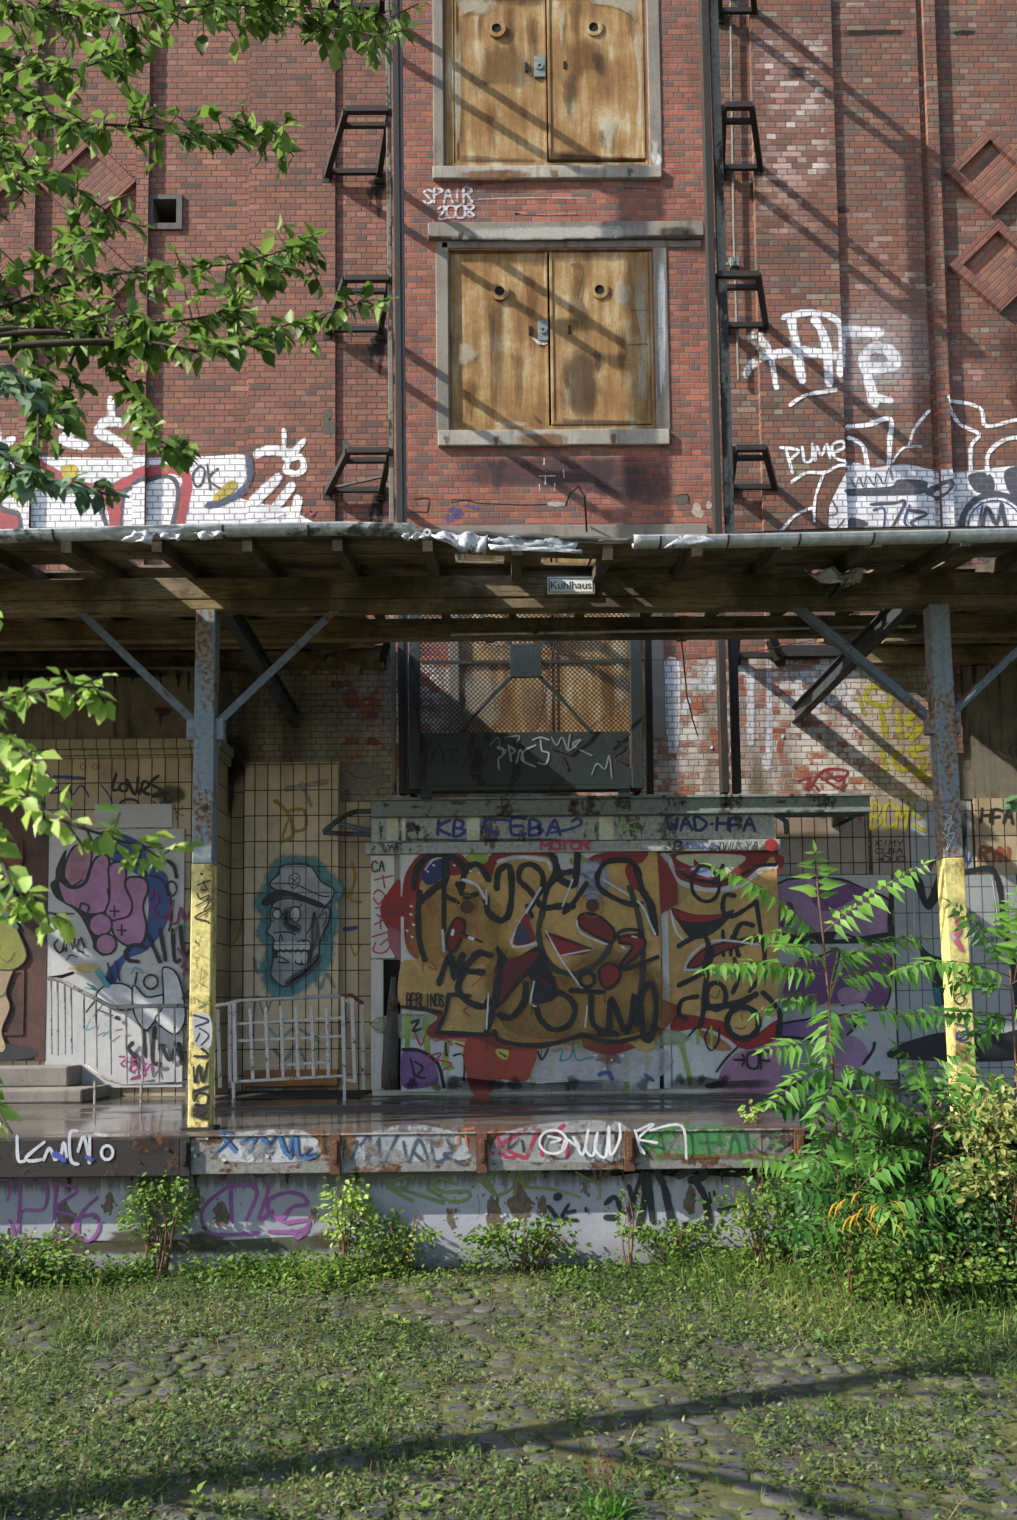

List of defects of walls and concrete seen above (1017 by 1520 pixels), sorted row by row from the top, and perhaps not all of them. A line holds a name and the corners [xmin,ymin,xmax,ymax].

peeling [690,695,718,749]
peeling [776,734,809,771]
corrosion [310,1128,355,1157]
corrosion [459,1126,503,1151]
peeling [580,1170,613,1197]
peeling [188,1186,230,1227]
peeling [308,1208,320,1224]
peeling [485,1182,549,1241]
peeling [682,1185,698,1215]